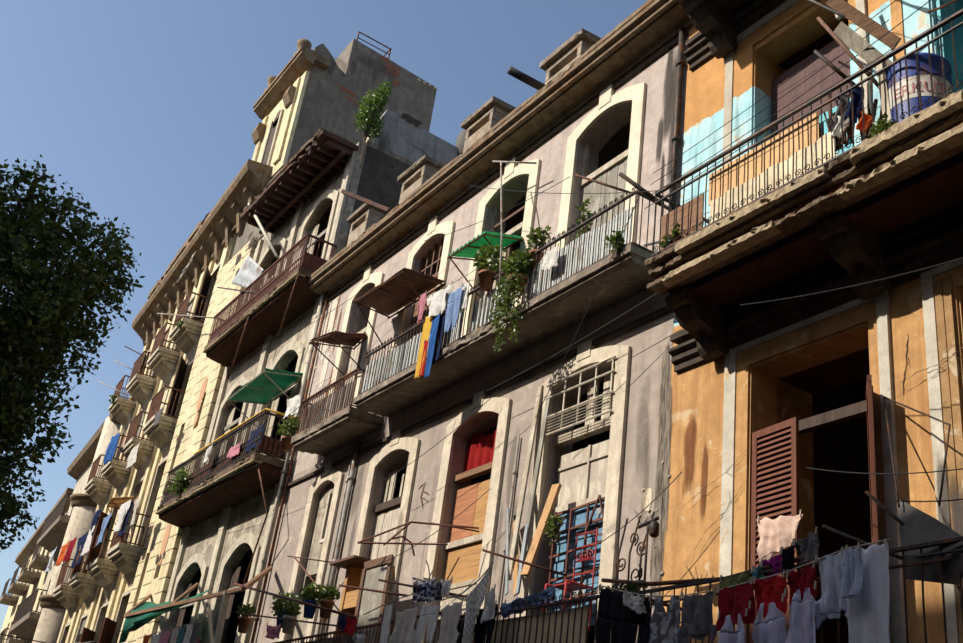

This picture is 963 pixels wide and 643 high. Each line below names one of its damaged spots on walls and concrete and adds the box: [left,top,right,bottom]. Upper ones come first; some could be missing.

spalling [381,56,400,87]
crack [889,334,963,394]
damp [683,419,707,514]